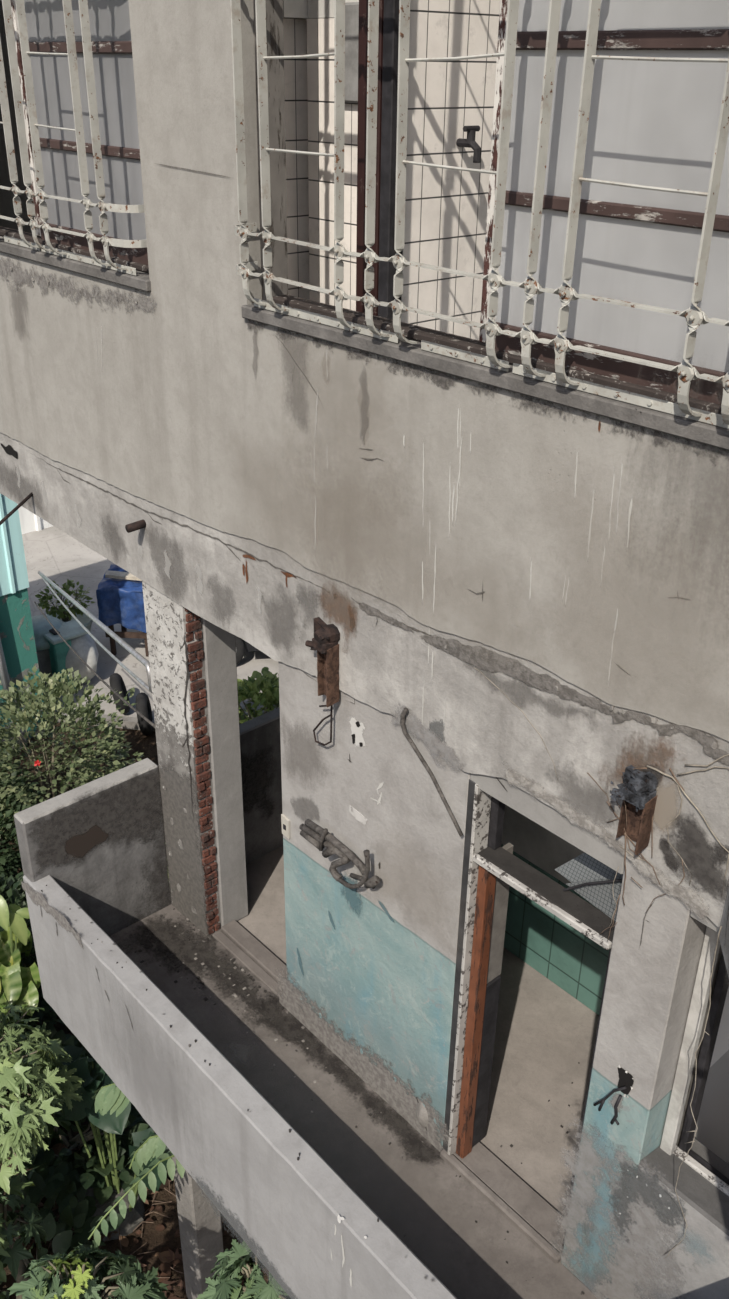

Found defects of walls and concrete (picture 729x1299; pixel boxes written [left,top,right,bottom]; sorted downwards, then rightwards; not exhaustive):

spalling [0,443,18,459]
rust [321,588,356,632]
crack [355,601,430,636]
peeling [158,766,211,940]
damp [660,816,729,899]
damp [29,770,441,1163]